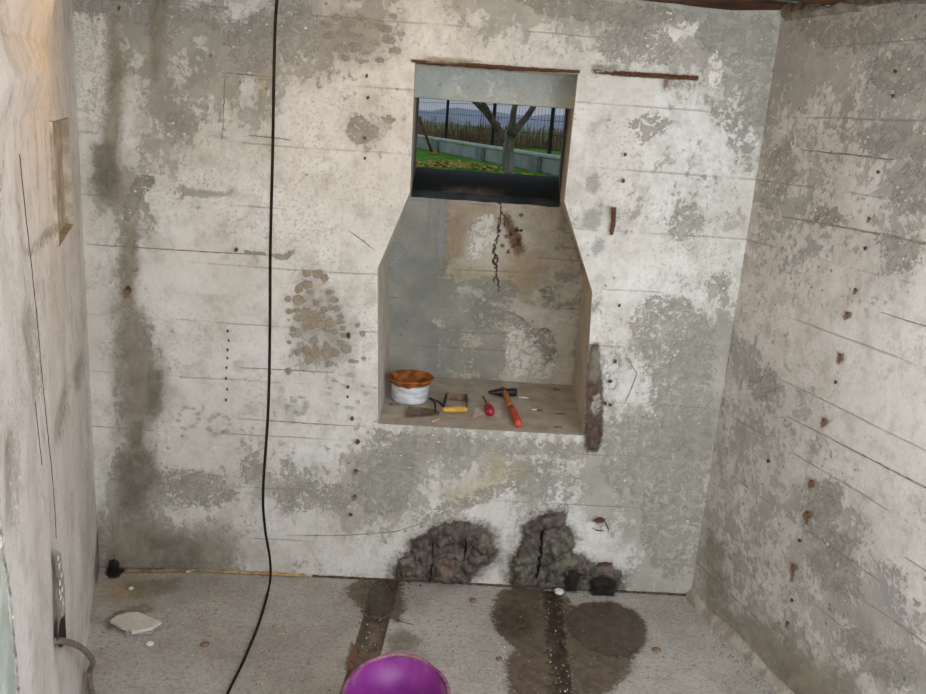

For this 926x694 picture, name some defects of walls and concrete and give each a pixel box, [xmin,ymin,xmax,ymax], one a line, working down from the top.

rust [594,65,699,88]
peeling [517,0,798,211]
peeling [789,2,926,104]
crack [440,203,541,292]
rust [501,213,525,255]
rust [609,207,617,235]
peeling [285,270,369,421]
damp [97,225,233,582]
spalling [272,428,626,597]
damp [345,644,358,671]
damp [347,579,419,651]
damp [491,587,647,694]